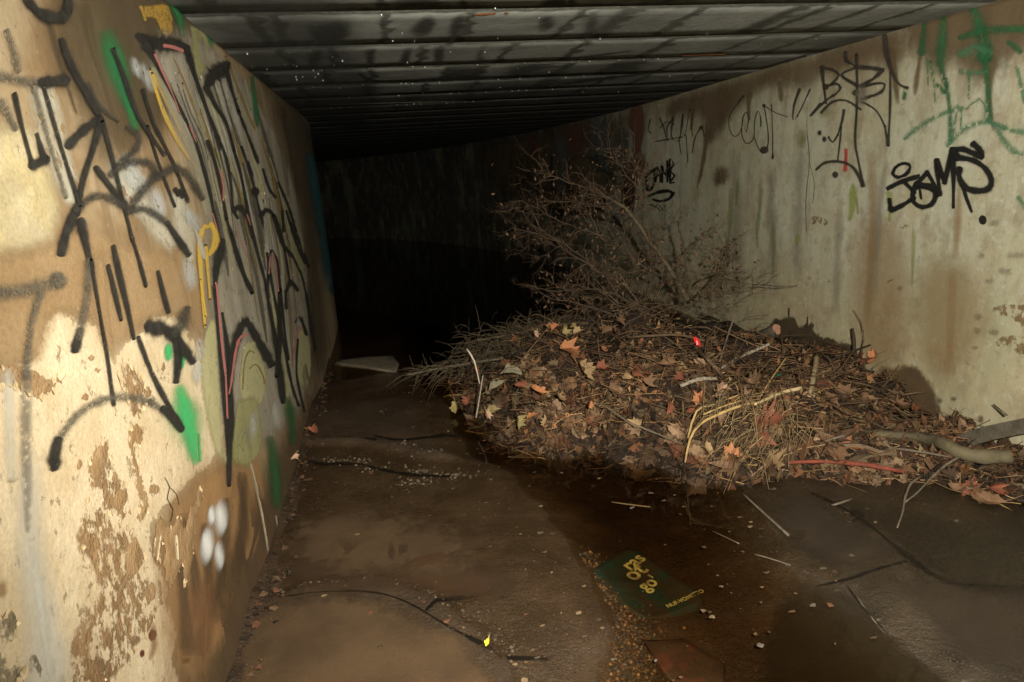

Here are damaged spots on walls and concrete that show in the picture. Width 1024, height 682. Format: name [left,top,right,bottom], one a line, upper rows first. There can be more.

spalling [993,305,1024,354]
peeling [0,364,68,416]
spalling [62,358,203,682]